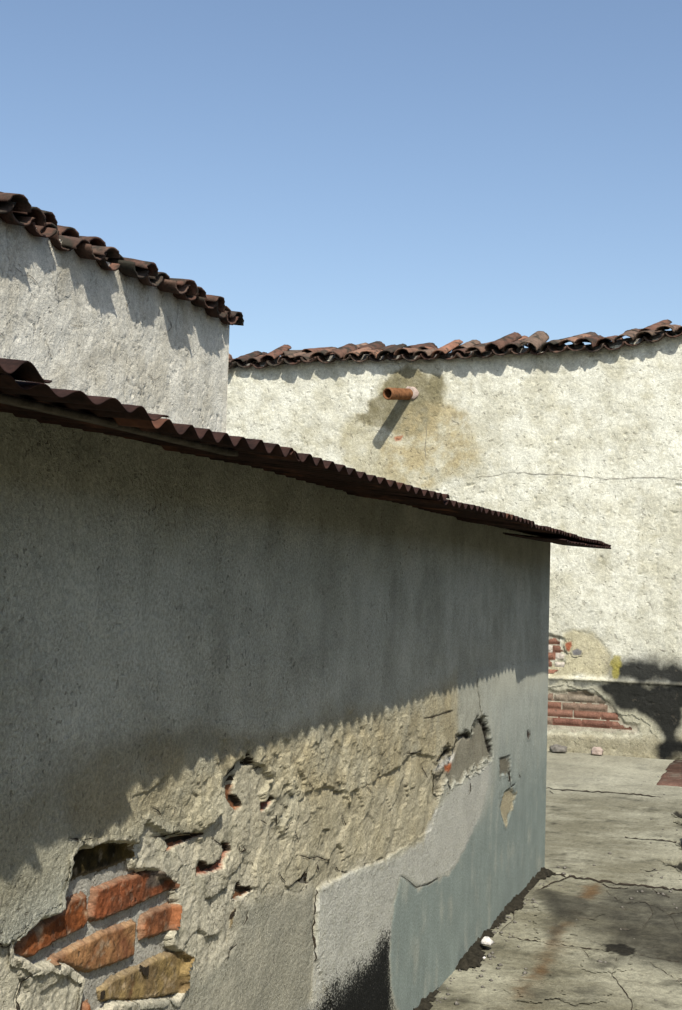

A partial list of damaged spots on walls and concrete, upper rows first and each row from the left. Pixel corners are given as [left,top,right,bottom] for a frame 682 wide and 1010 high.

leakage [335,362,489,493]
spalling [547,626,641,736]
spalling [225,776,242,811]
spalling [260,797,274,812]
peeling [290,713,518,970]
spalling [9,832,204,1010]
crack [499,913,592,957]
crack [537,868,682,927]
crack [15,974,33,1010]
crack [612,951,681,1010]